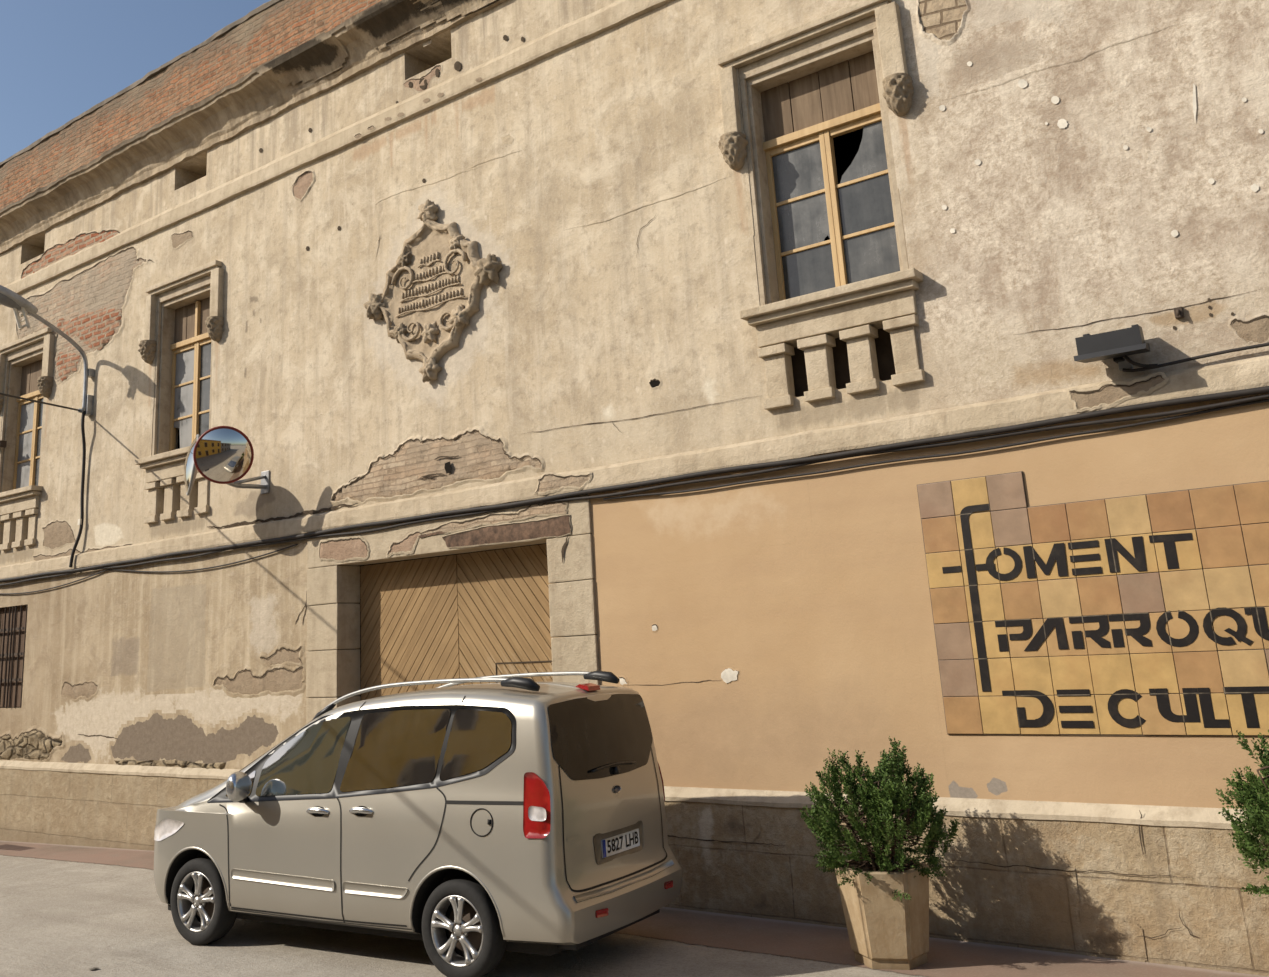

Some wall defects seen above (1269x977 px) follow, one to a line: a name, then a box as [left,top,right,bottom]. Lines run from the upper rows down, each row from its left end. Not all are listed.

flaking render [916,0,971,46]
flaking render [292,169,316,202]
flaking render [21,228,122,279]
flaking render [54,308,122,381]
flaking render [1227,312,1269,345]
flaking render [1068,372,1170,412]
flaking render [209,425,592,557]
flaking render [318,535,370,562]
flaking render [212,643,306,698]